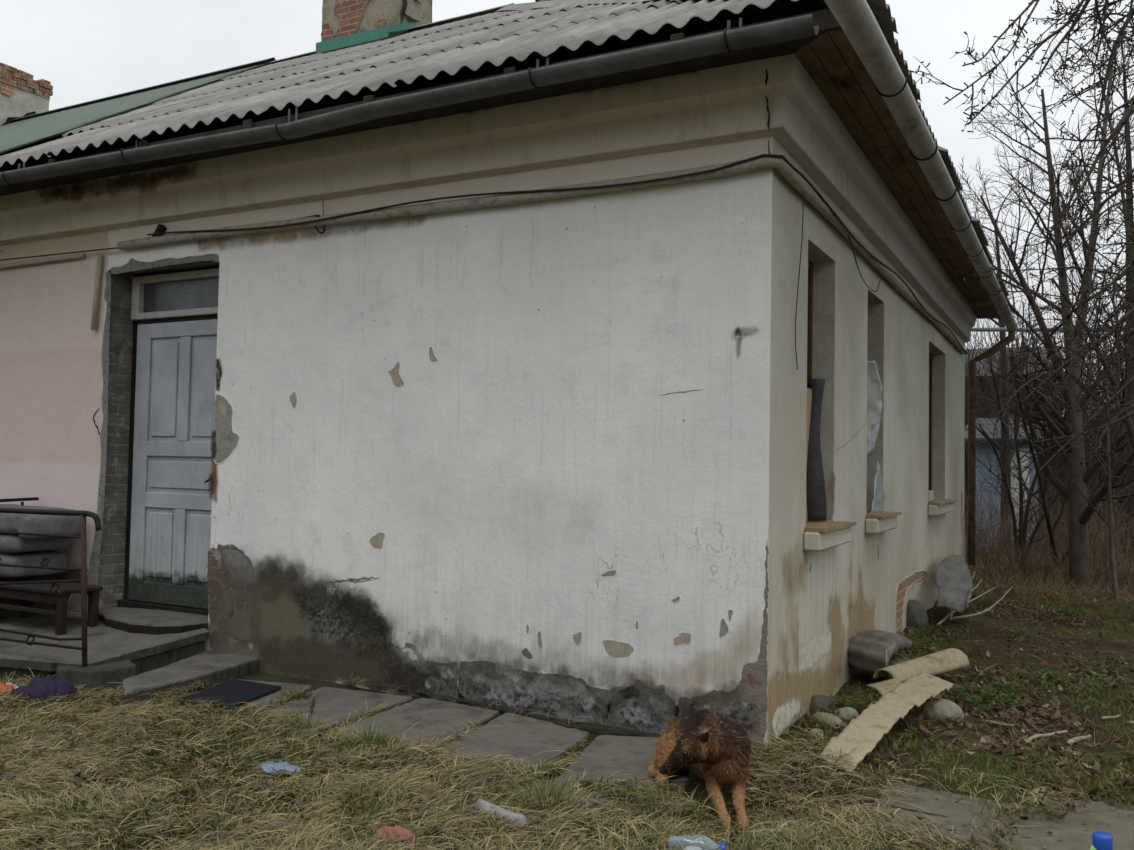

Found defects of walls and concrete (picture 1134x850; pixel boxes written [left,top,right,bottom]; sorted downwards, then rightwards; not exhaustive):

flaking render [321,0,371,52]
crack [400,0,421,24]
crack [763,70,771,154]
peeling [387,361,405,388]
peeling [428,345,438,363]
flaking render [214,393,241,465]
peeling [369,531,386,550]
flaking render [207,542,255,630]
water stain [208,558,698,730]
flaking render [382,539,800,748]
water stain [768,575,874,738]